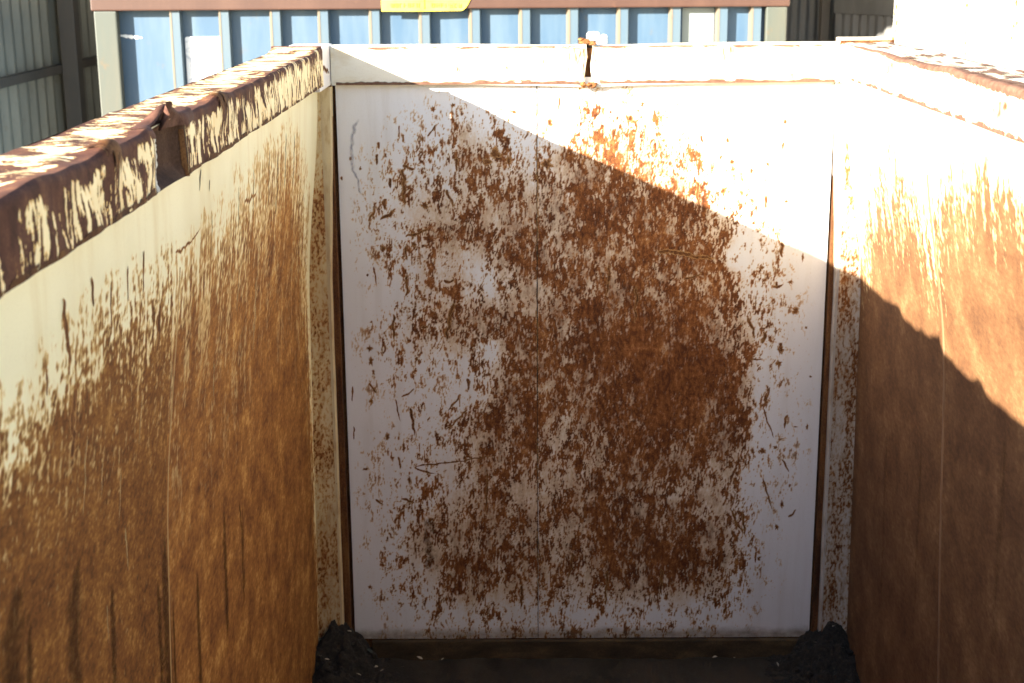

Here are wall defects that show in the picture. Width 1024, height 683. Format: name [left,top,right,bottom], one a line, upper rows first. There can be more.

corrosion [457,46,577,64]
corrosion [600,44,822,61]
corrosion [0,84,341,683]
corrosion [336,66,1024,683]